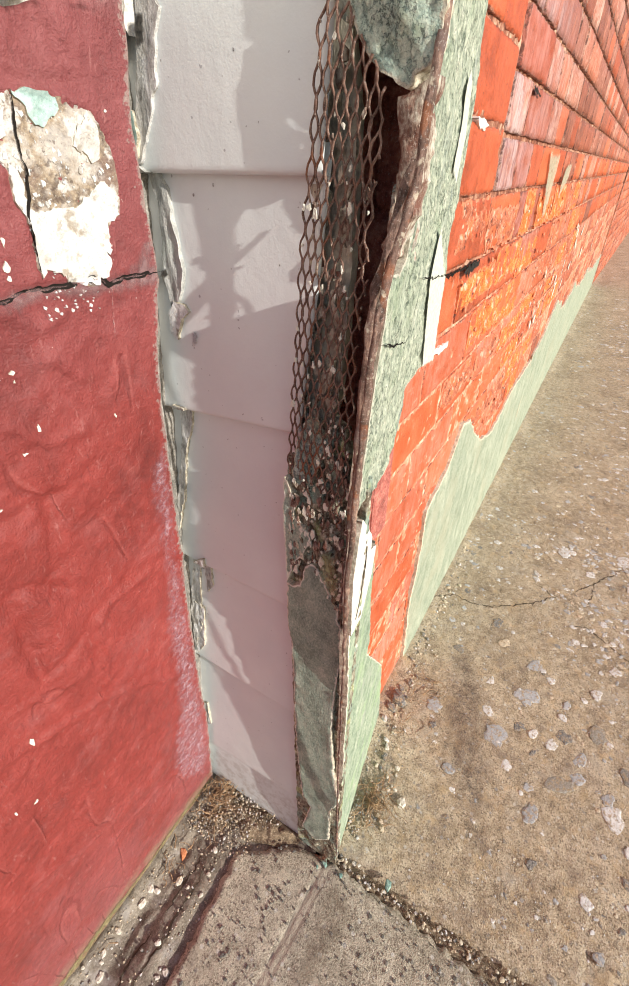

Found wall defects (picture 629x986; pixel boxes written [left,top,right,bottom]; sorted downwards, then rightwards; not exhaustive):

spalling [331,92,349,138]
peeling [454,69,472,183]
peeling [0,86,120,321]
crack [0,93,161,305]
spalling [302,164,353,224]
spalling [330,244,353,317]
crack [423,259,480,280]
spalling [423,180,603,435]
spalling [288,332,376,636]
crack [435,570,629,662]